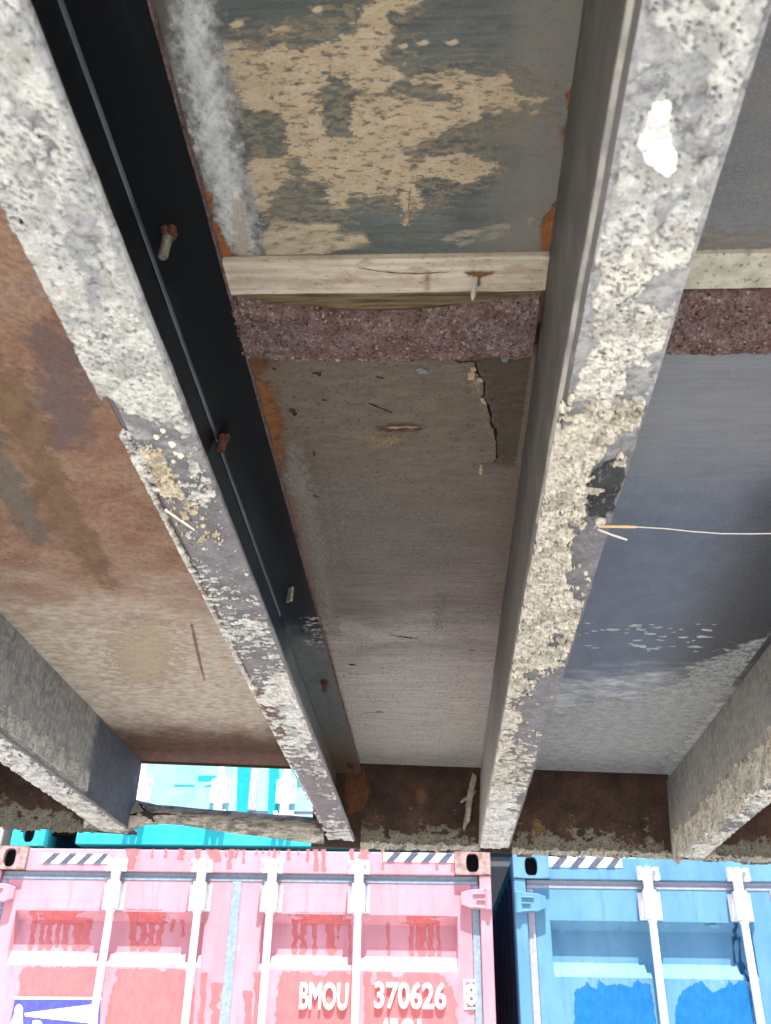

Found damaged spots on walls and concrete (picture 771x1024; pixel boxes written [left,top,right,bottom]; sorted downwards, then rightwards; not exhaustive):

peeling [210,0,562,255]
corrosion [540,201,556,251]
corrosion [26,324,97,451]
peeling [0,0,349,840]
corrosion [232,292,540,469]
crack [455,356,531,475]
peeling [360,61,771,865]
corrosion [190,624,205,681]